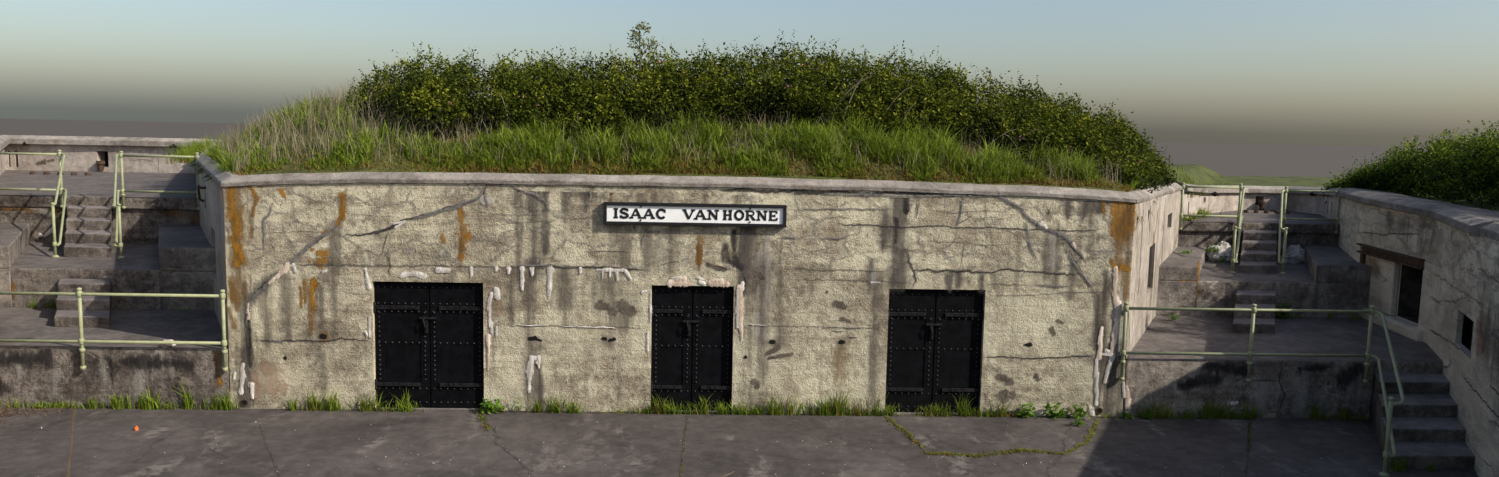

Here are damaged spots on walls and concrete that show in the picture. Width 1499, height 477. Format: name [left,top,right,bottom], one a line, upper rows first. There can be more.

corrosion [221,186,286,329]
corrosion [299,192,346,334]
corrosion [428,208,471,262]
crack [245,184,747,359]
crack [722,188,1103,296]
corrosion [1101,201,1137,300]
leakage [525,349,543,407]
crack [751,320,876,338]
crack [1361,221,1499,473]